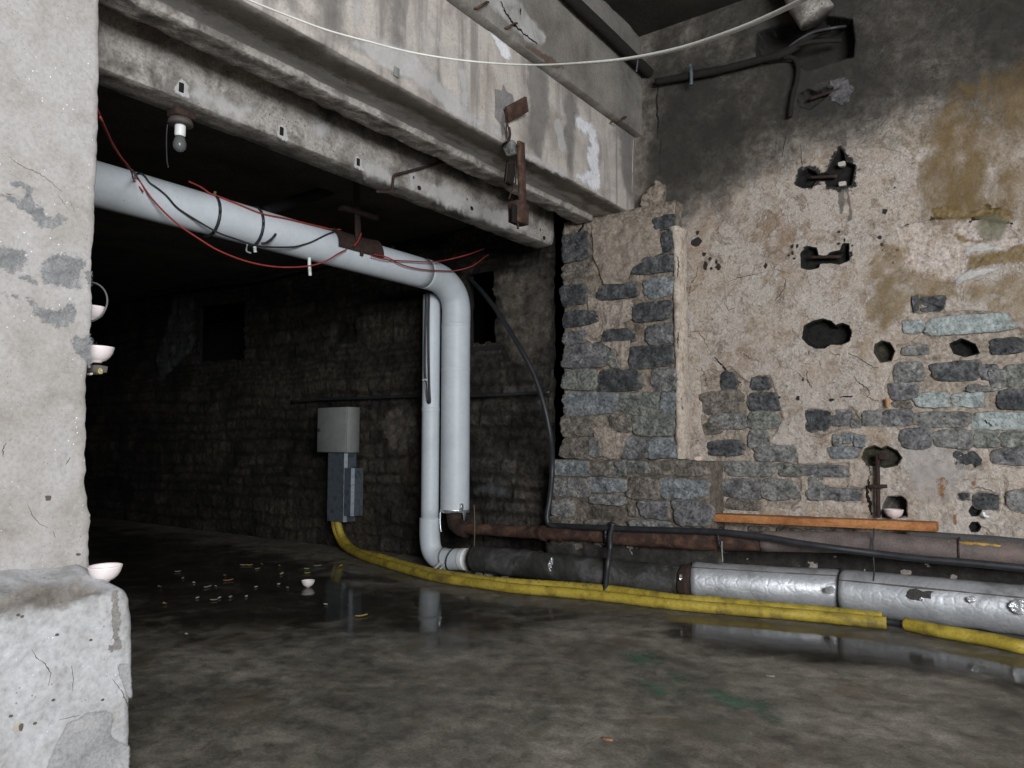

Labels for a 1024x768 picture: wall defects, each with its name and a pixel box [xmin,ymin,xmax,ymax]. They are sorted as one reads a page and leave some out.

crack [501,2,537,44]
damp [652,0,1024,203]
damp [838,188,852,221]
flaking render [592,216,662,284]
flaking render [691,206,1024,514]
spalling [881,495,908,518]